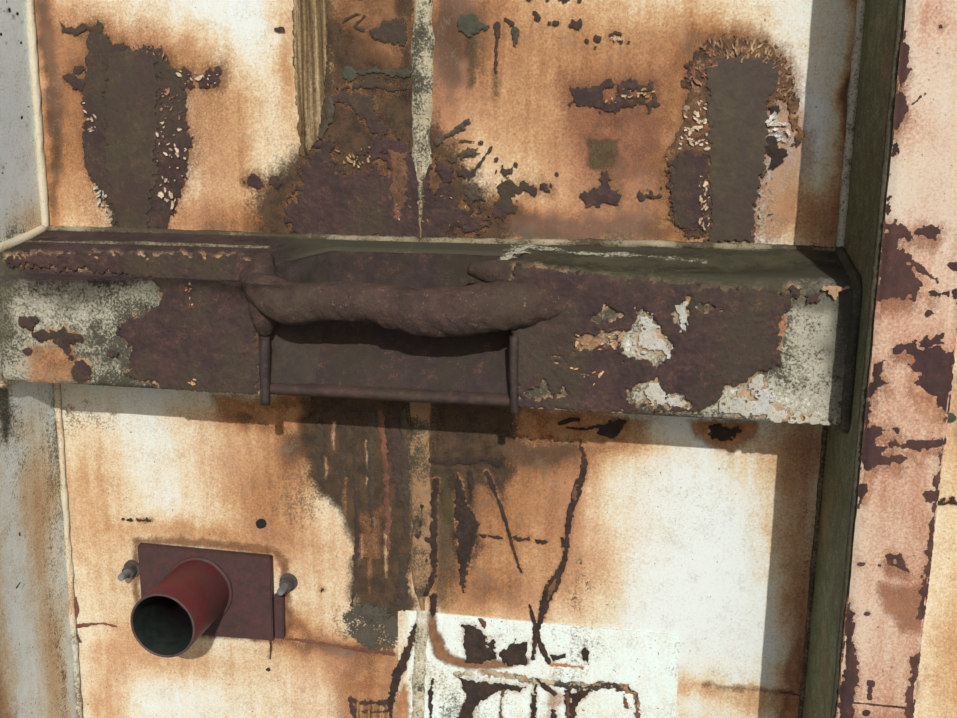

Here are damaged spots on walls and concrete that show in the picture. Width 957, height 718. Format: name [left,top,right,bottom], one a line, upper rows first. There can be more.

peeling [660,33,805,243]
corrosion [1,0,559,623]
peeling [631,309,673,359]
peeling [675,299,689,333]
peeling [787,284,850,304]
peeling [644,379,690,410]
peeling [719,372,837,425]
corrosion [429,262,793,604]
corrosion [201,592,307,672]
corrosion [428,611,514,669]